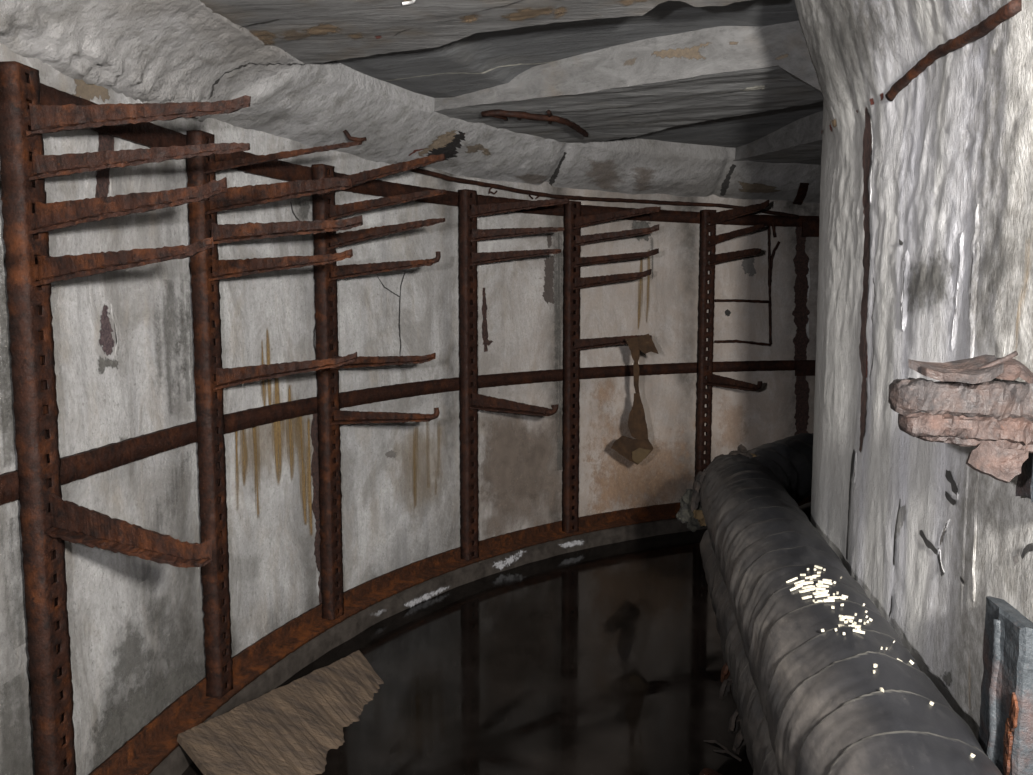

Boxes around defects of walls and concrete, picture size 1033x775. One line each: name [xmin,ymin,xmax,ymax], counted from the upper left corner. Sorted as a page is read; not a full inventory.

rust [249,30,277,45]
rust [638,256,650,329]
water stain [907,252,951,311]
rust [262,378,291,406]
rust [235,427,260,516]
rust [273,416,312,535]